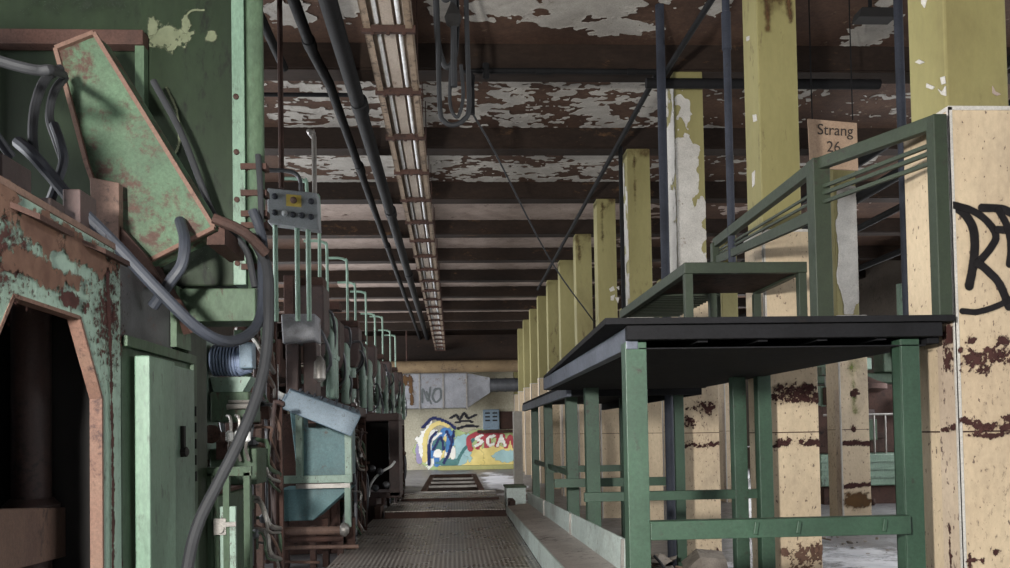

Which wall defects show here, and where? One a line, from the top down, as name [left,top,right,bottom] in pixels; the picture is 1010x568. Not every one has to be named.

peeling [424,0,676,37]
peeling [264,81,357,128]
peeling [284,156,396,182]
peeling [419,81,755,273]
peeling [427,156,630,322]
peeling [835,186,870,315]
corrosion [940,323,1010,376]
corrosion [0,179,120,568]
corrosion [771,381,819,404]
corrosion [772,436,820,448]
corrosion [941,414,1010,440]
corrosion [844,481,872,511]